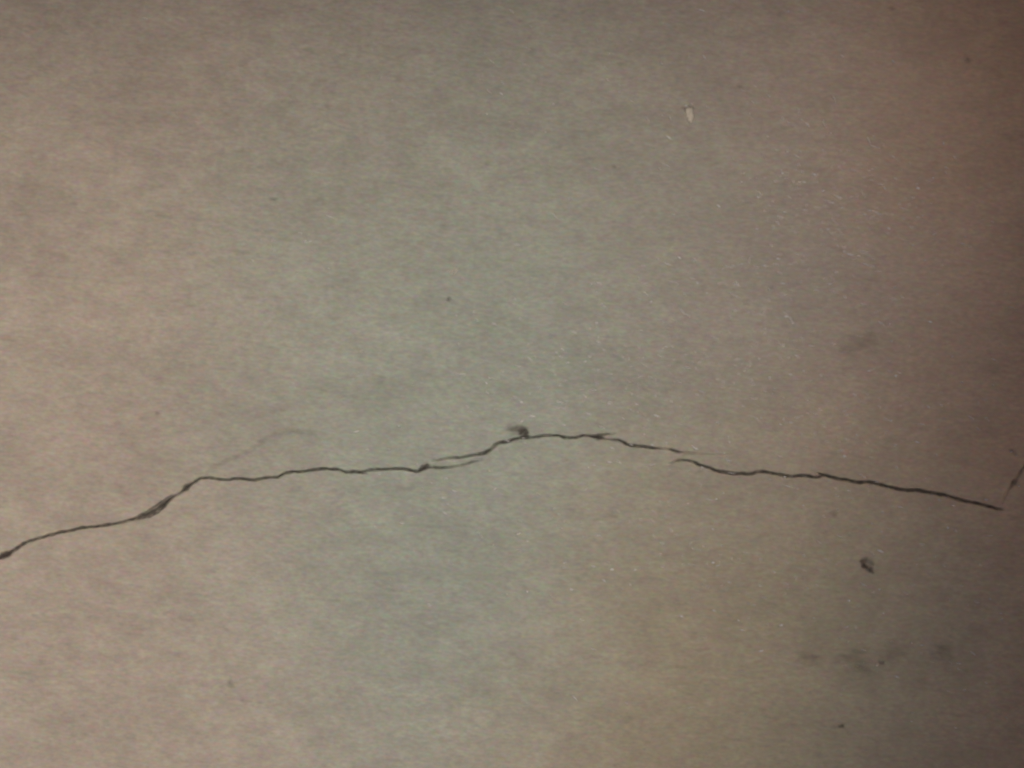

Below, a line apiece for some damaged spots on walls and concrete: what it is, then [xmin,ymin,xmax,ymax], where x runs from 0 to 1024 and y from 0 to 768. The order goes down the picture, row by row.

crack [0,429,997,558]